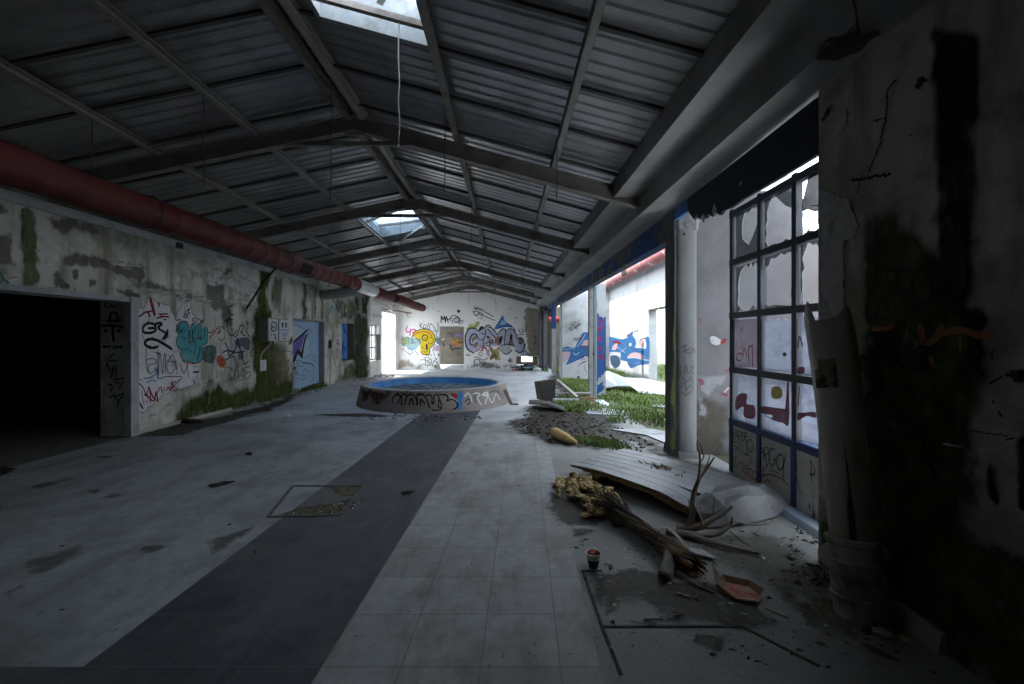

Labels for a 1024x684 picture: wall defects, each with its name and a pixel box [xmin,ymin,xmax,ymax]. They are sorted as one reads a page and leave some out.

leakage [0,236,39,264]
leakage [254,276,271,320]
peeling [818,187,858,320]
crack [842,79,897,306]
leakage [931,28,987,373]